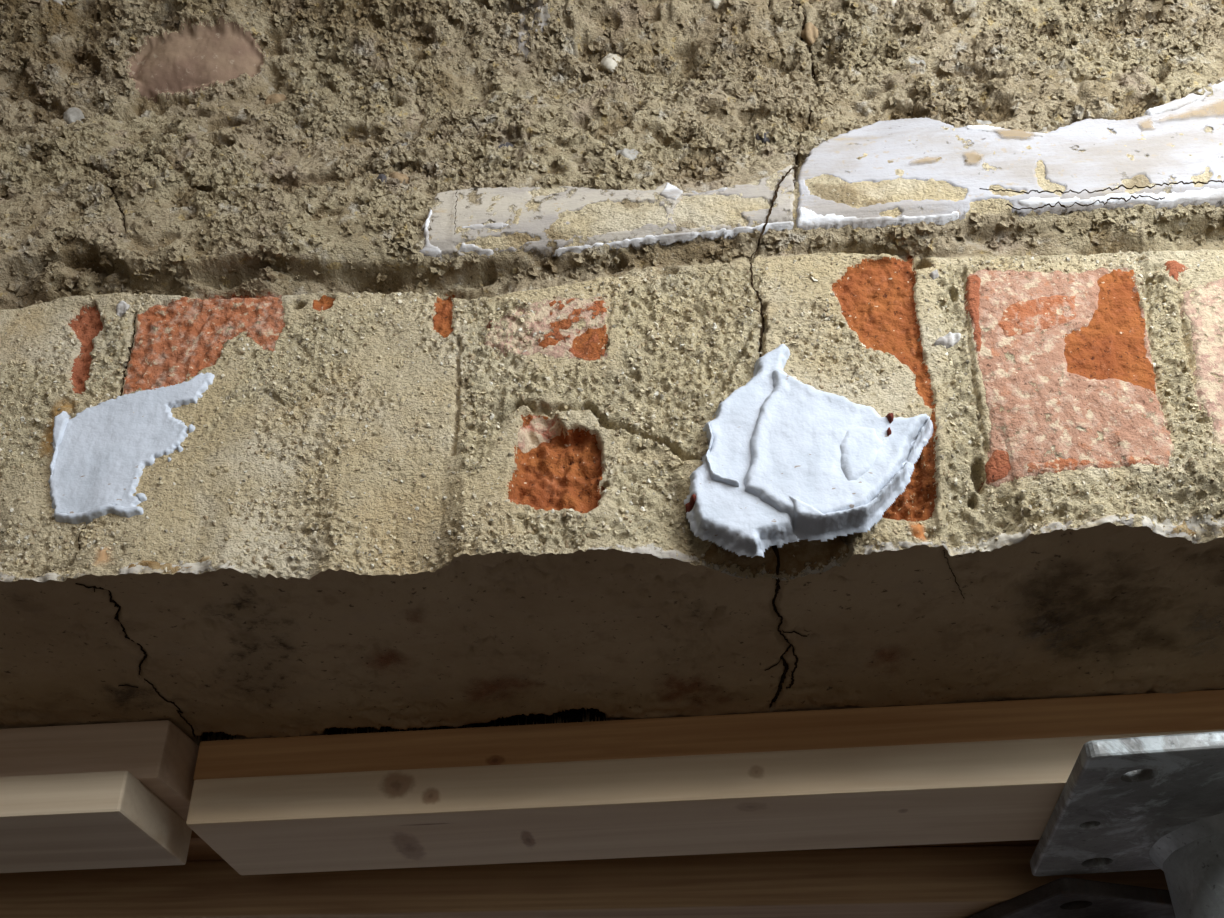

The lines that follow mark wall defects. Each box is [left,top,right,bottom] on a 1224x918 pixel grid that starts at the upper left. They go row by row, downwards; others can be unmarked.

crack [745,0,816,358]
flaking render [419,81,1224,261]
leakage [45,404,73,452]
crack [120,317,136,396]
spalling [122,292,285,394]
spalling [507,414,605,514]
spalling [832,255,938,522]
peeling [964,267,1175,493]
crack [36,527,195,737]
crack [765,545,807,708]